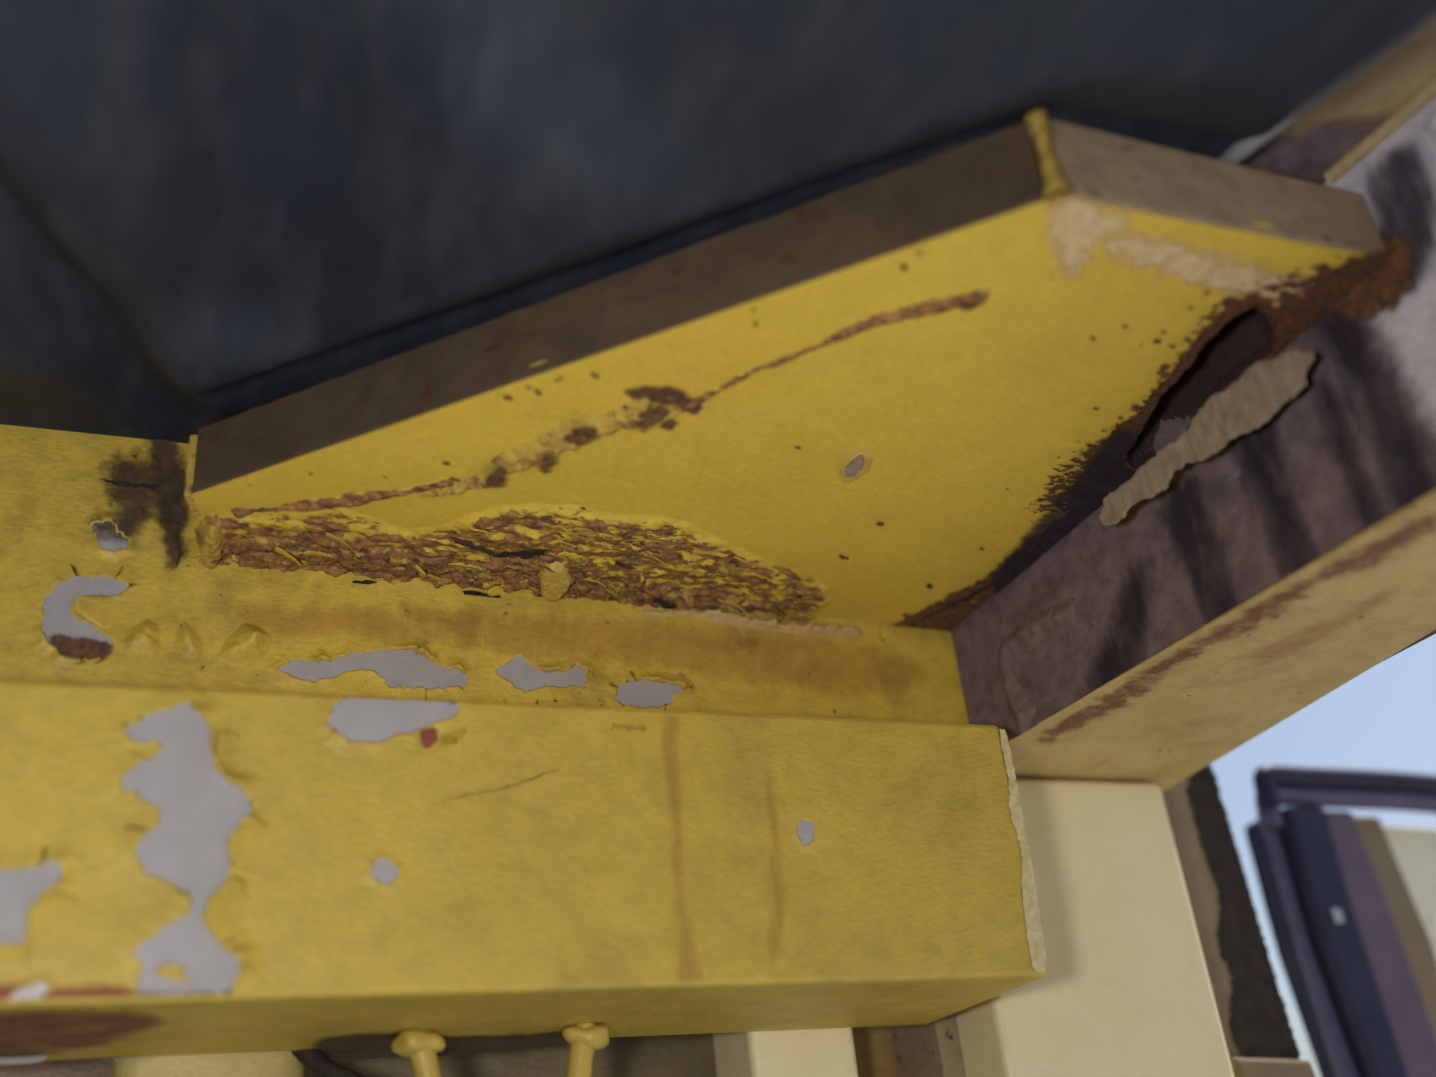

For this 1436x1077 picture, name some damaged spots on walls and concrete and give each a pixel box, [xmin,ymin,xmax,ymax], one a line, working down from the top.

peeling [1025,109,1311,459]
peeling [15,511,153,680]
corrosion [93,438,833,622]
corrosion [625,386,702,430]
corrosion [893,232,1436,742]
peeling [264,636,699,760]
peeling [0,843,87,1000]
peeling [96,690,274,998]
corrosion [0,985,159,1057]